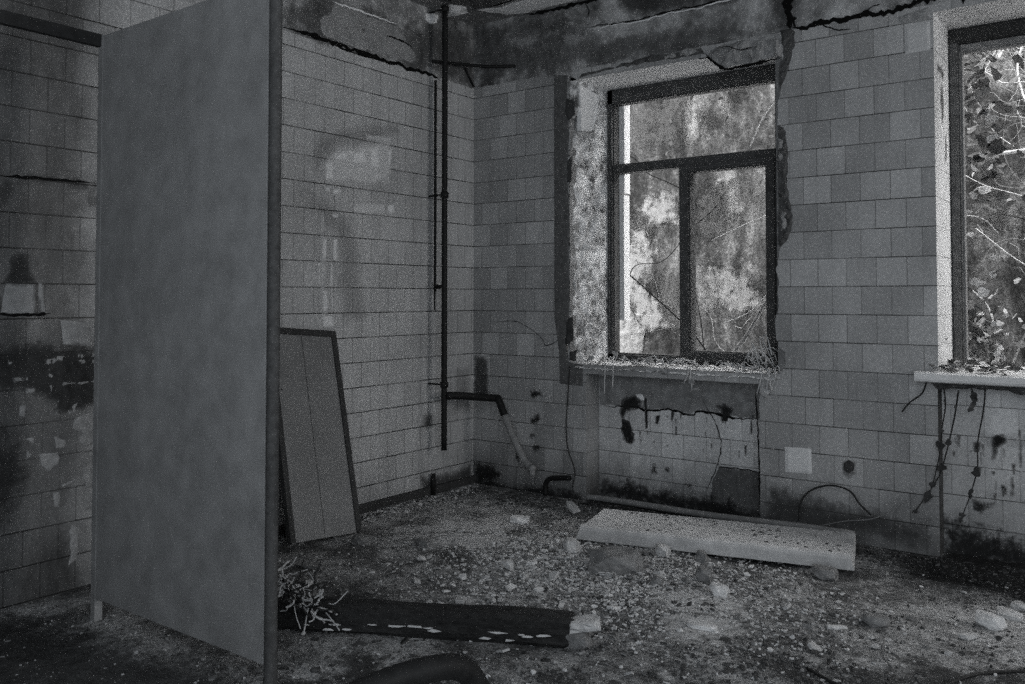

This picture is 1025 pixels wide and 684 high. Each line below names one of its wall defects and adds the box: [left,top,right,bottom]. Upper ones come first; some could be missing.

flaking render [318,1,416,62]
crack [522,0,730,30]
crack [782,0,936,31]
flaking render [554,48,705,386]
peeling [599,375,760,434]
peeling [711,466,760,518]
water stain [944,502,1025,565]